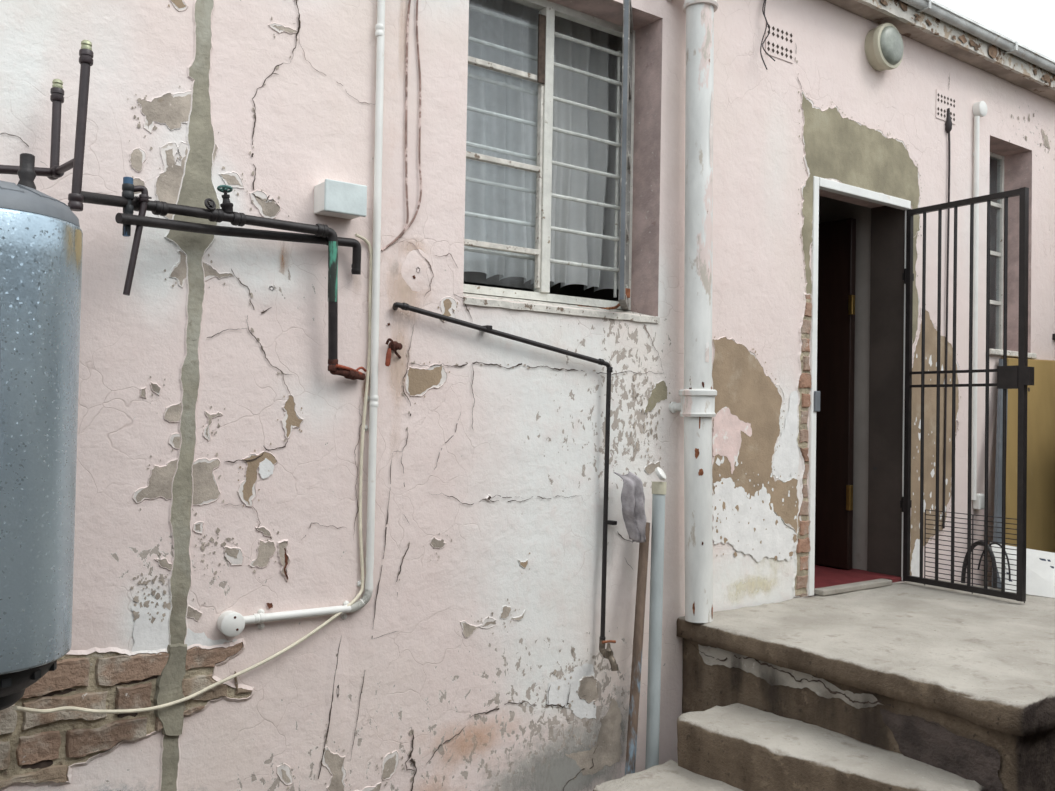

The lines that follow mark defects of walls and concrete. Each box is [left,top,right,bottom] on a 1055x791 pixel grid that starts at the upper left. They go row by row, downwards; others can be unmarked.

peeling [127,86,192,220]
crack [249,0,374,209]
peeling [402,361,450,404]
peeling [712,90,960,598]
peeling [192,406,291,582]
crack [301,403,362,540]
crack [372,303,659,639]
flaking render [0,552,172,790]
flaking render [182,598,254,717]
crack [318,640,365,779]
crack [405,685,586,791]
peeling [698,644,1004,791]